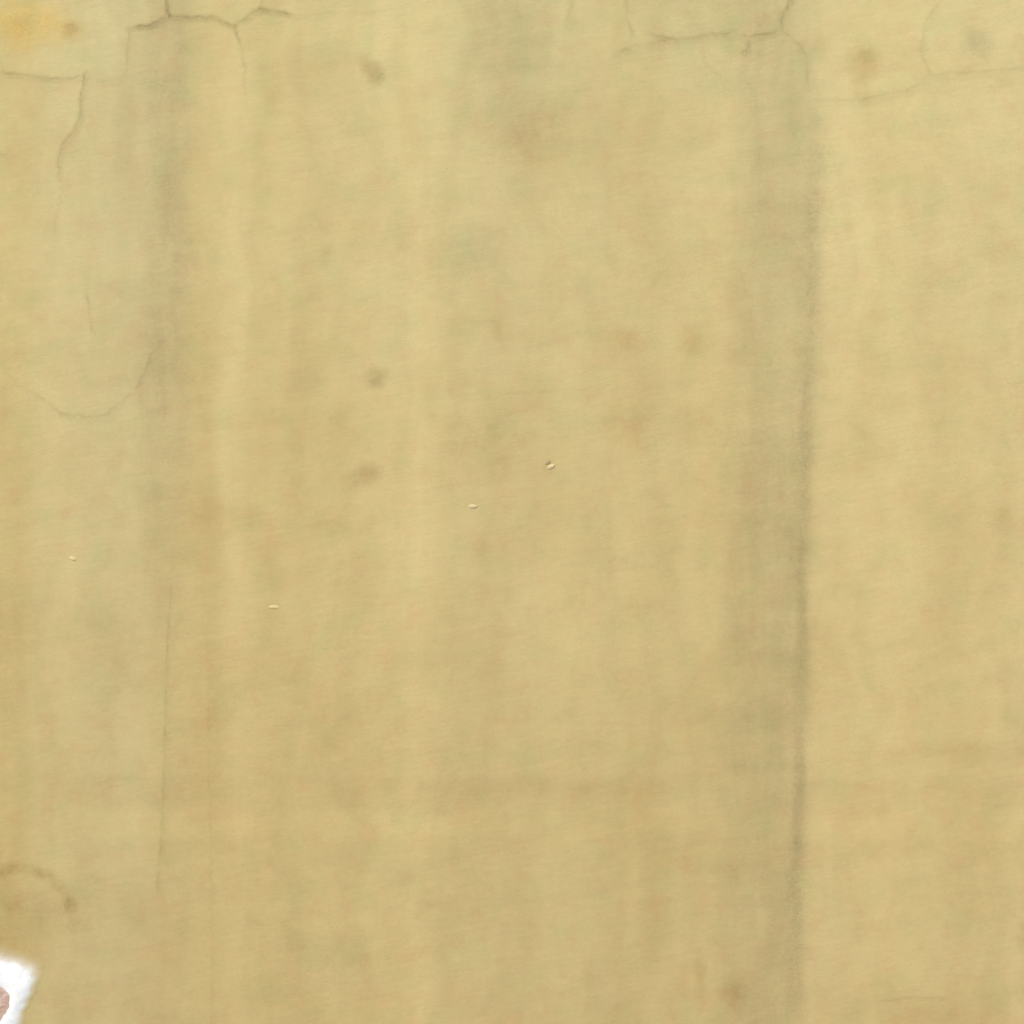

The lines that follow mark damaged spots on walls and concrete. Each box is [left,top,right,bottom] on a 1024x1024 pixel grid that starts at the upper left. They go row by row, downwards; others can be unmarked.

spalling [0,944,45,1024]